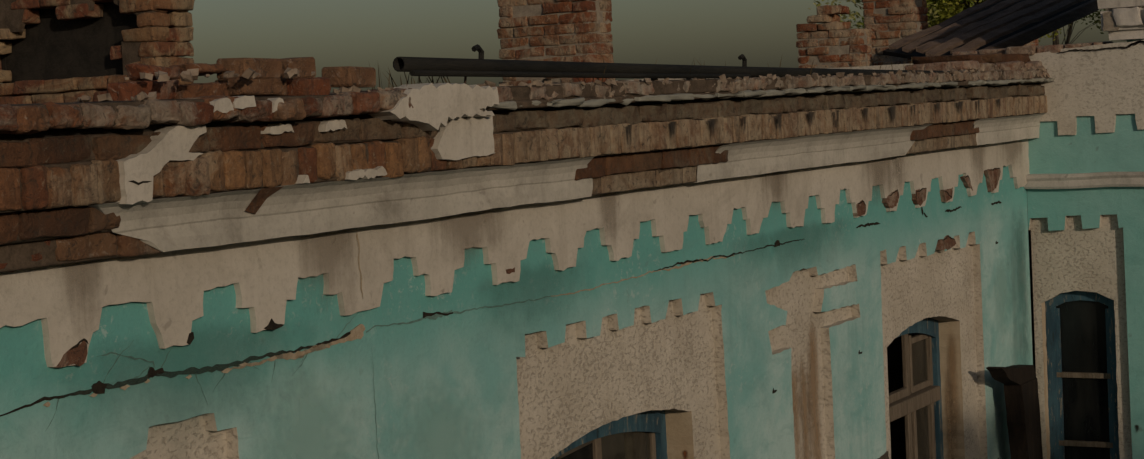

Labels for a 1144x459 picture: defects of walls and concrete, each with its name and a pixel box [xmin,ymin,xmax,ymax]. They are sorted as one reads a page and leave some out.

peeling [210,96,294,135]
peeling [318,120,347,132]
peeling [369,83,499,161]
peeling [113,125,207,205]
spalling [245,175,310,214]
peeling [345,166,387,180]
spalling [853,200,866,216]
spalling [882,175,973,208]
spalling [984,168,1001,192]
spalling [52,338,88,368]
crack [0,239,805,430]
water stain [792,339,820,459]